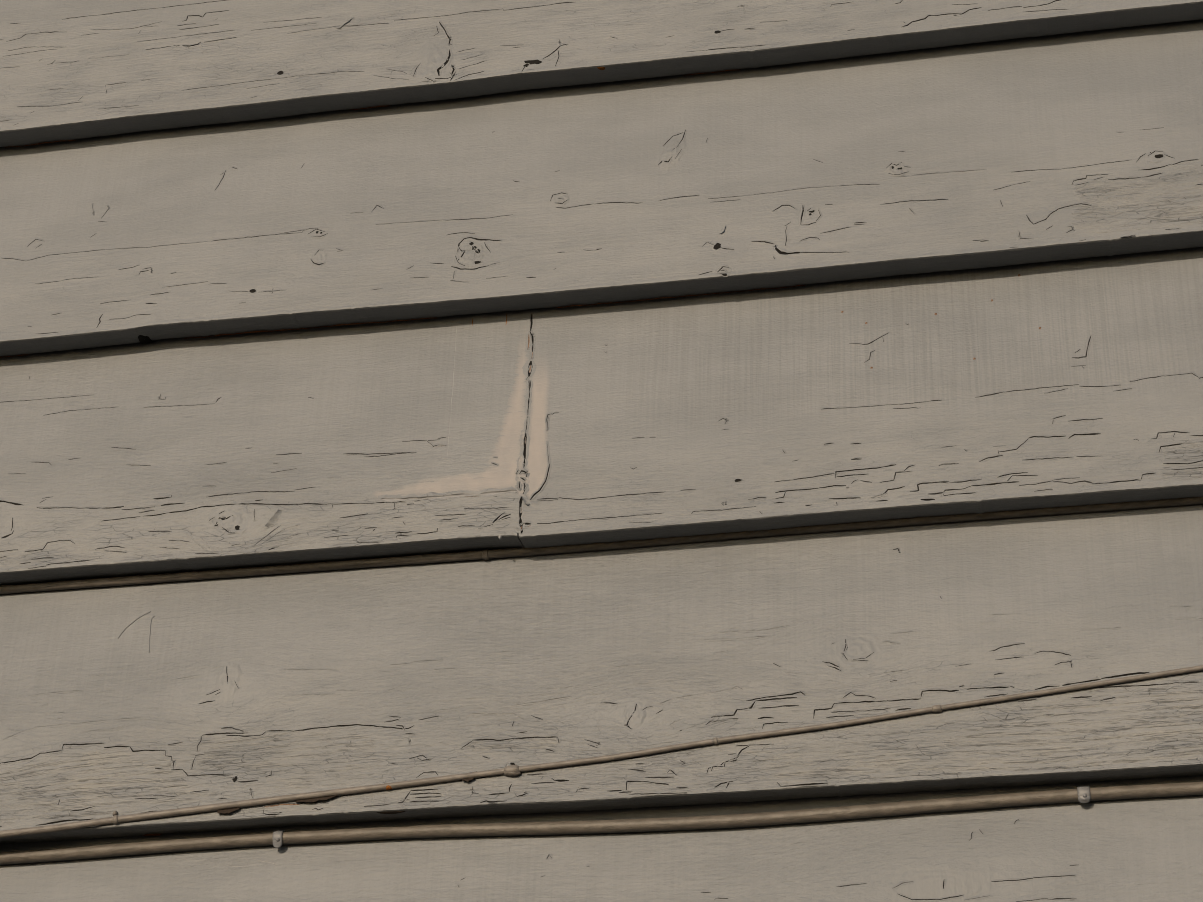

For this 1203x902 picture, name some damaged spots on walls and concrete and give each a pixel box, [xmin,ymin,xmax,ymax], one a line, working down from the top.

crack [849,323,909,363]
crack [0,335,1203,570]
crack [0,666,441,814]
crack [460,639,1200,804]
crack [36,800,95,827]
crack [701,891,728,901]
crack [836,863,1079,902]